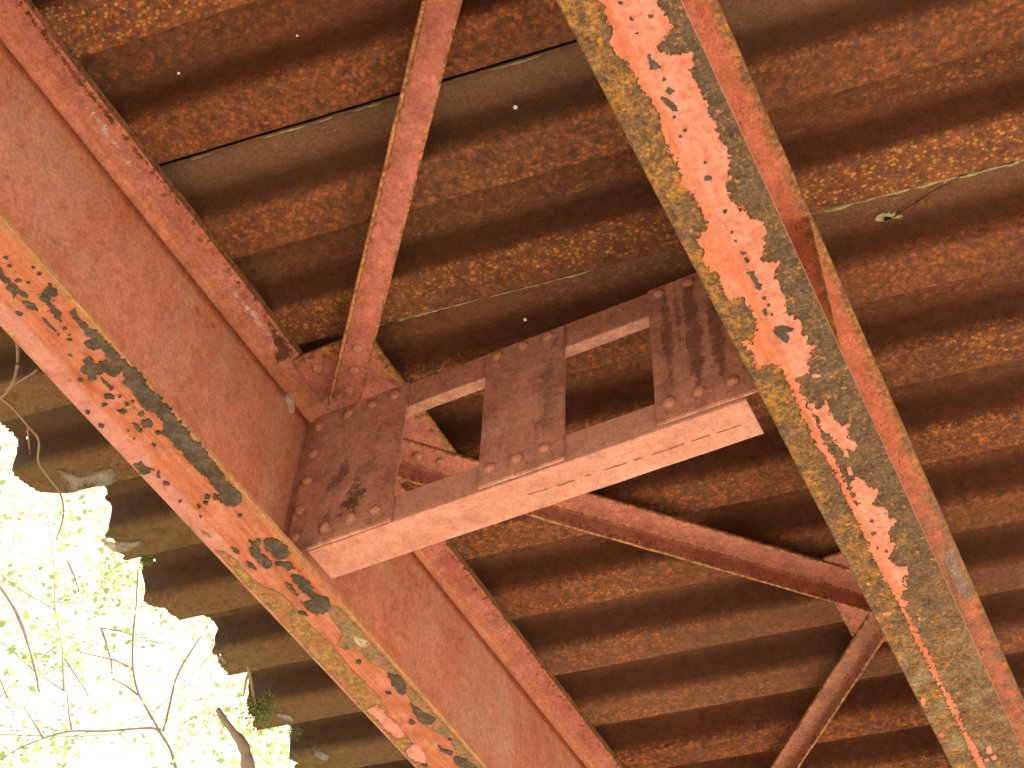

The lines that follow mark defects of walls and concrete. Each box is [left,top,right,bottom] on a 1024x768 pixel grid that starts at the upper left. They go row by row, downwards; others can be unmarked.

peeling [228,282,271,339]
peeling [0,256,243,518]
peeling [598,0,997,768]
peeling [231,537,331,616]
peeling [367,673,436,767]
peeling [438,738,476,768]